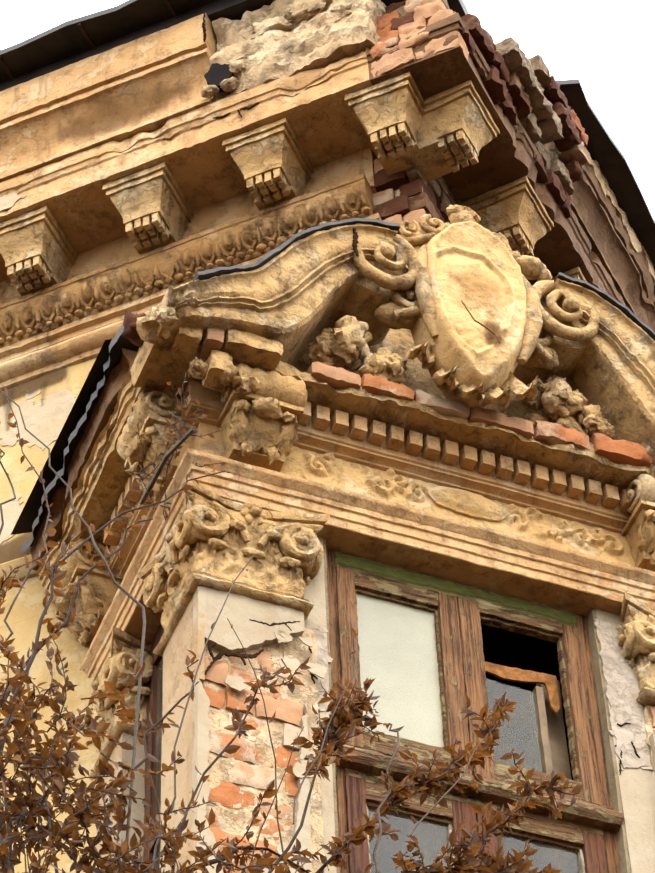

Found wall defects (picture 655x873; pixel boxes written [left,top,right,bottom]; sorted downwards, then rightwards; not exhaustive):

crack [461,300,500,344]
crack [249,619,300,631]
crack [205,643,264,675]
peeling [594,618,655,774]
spalling [202,623,333,873]